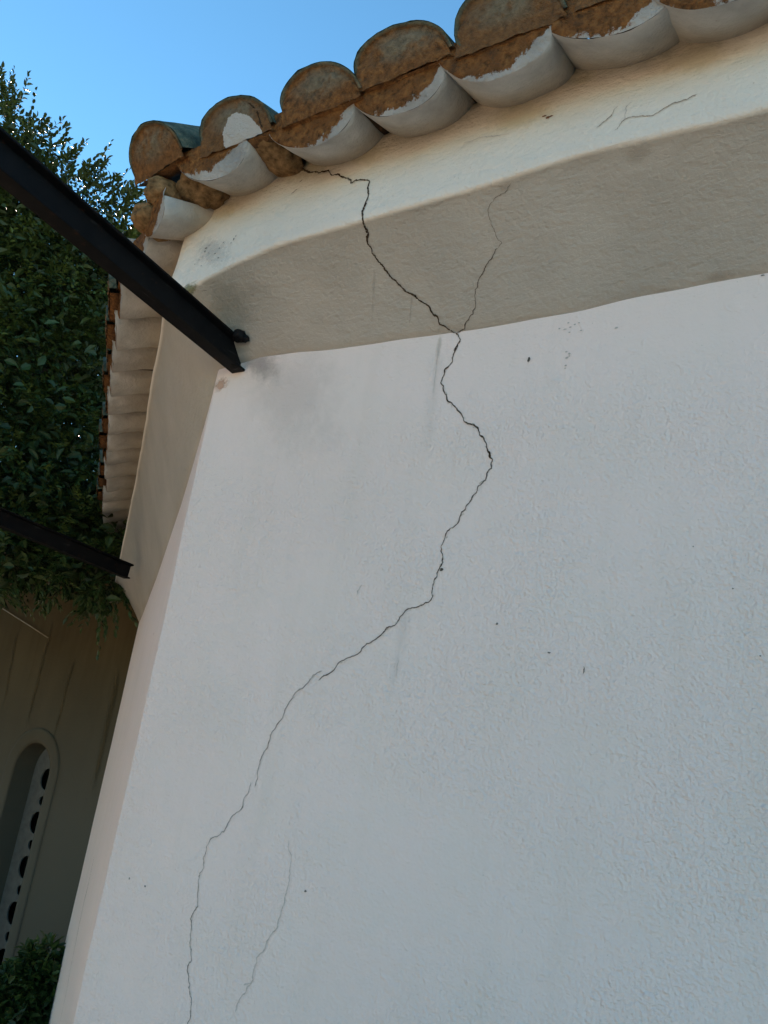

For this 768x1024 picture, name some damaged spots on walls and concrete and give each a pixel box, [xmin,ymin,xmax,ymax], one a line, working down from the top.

crack [598,94,696,130]
crack [187,168,510,1024]